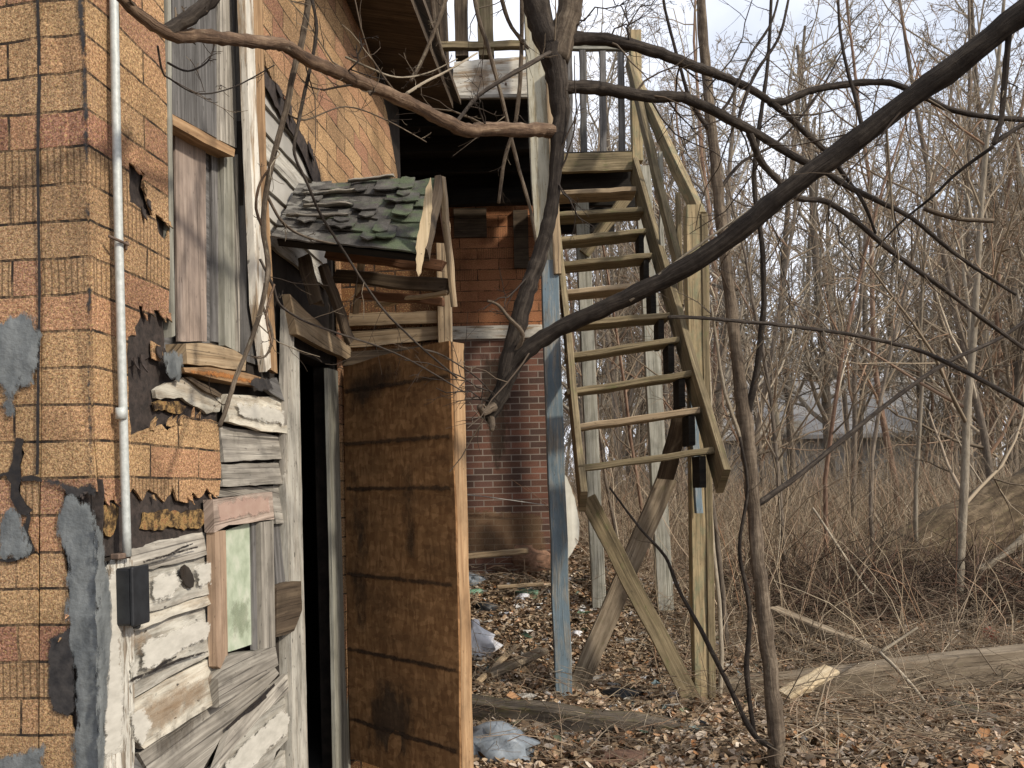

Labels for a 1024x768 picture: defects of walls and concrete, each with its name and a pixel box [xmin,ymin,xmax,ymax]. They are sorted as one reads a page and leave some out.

peeling [134,163,174,229]
peeling [139,341,163,372]
peeling [150,407,202,431]